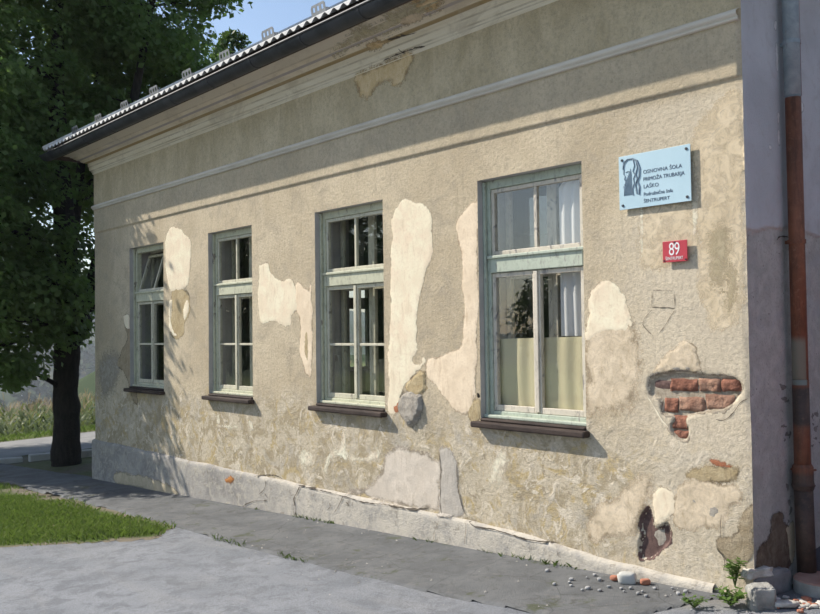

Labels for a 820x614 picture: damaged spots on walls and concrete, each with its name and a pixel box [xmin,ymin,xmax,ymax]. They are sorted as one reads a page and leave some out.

peeling [332,0,443,58]
peeling [165,226,191,340]
peeling [258,262,313,378]
peeling [387,198,481,421]
peeling [585,280,747,443]
peeling [345,446,442,511]
crack [245,456,559,544]
peeling [587,459,795,571]